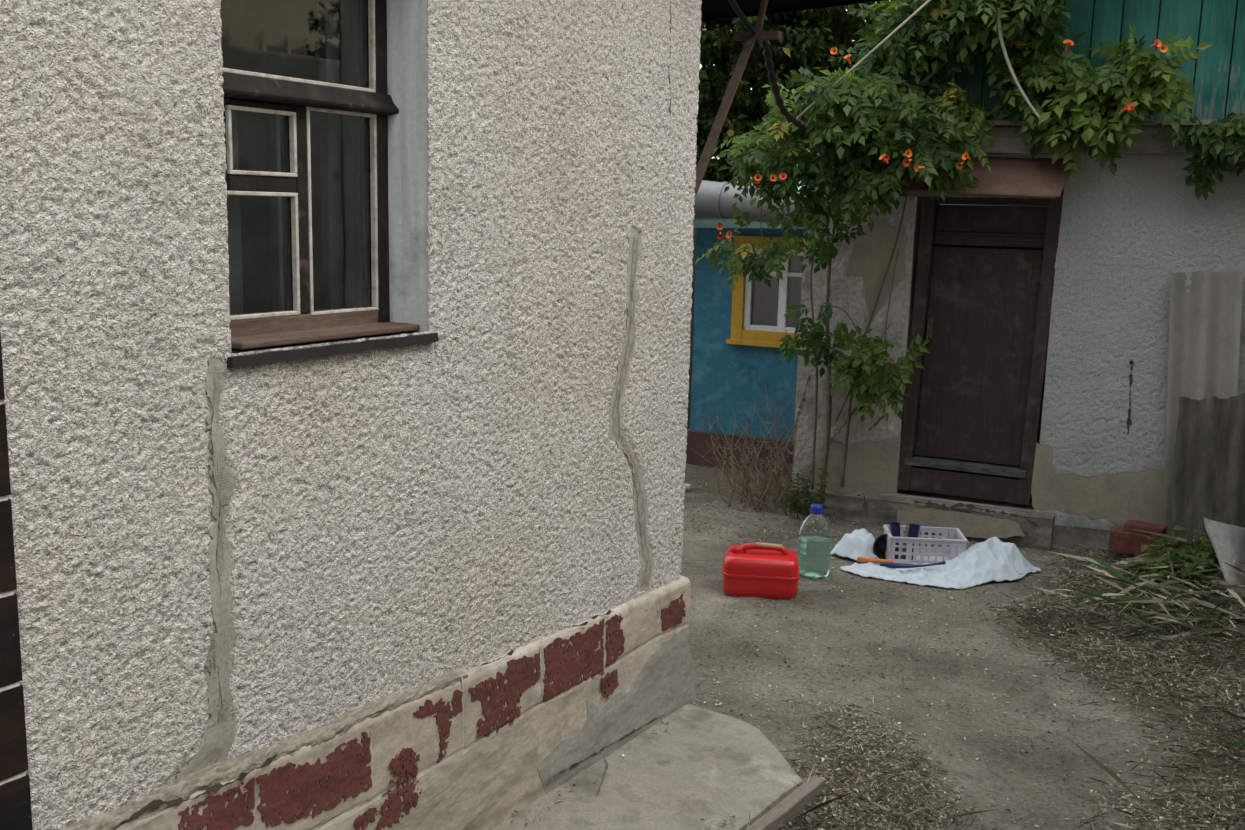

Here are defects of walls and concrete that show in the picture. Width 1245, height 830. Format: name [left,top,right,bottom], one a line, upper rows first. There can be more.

crack [211,382,227,590]
peeling [661,592,686,631]
peeling [413,614,625,762]
peeling [178,731,422,830]